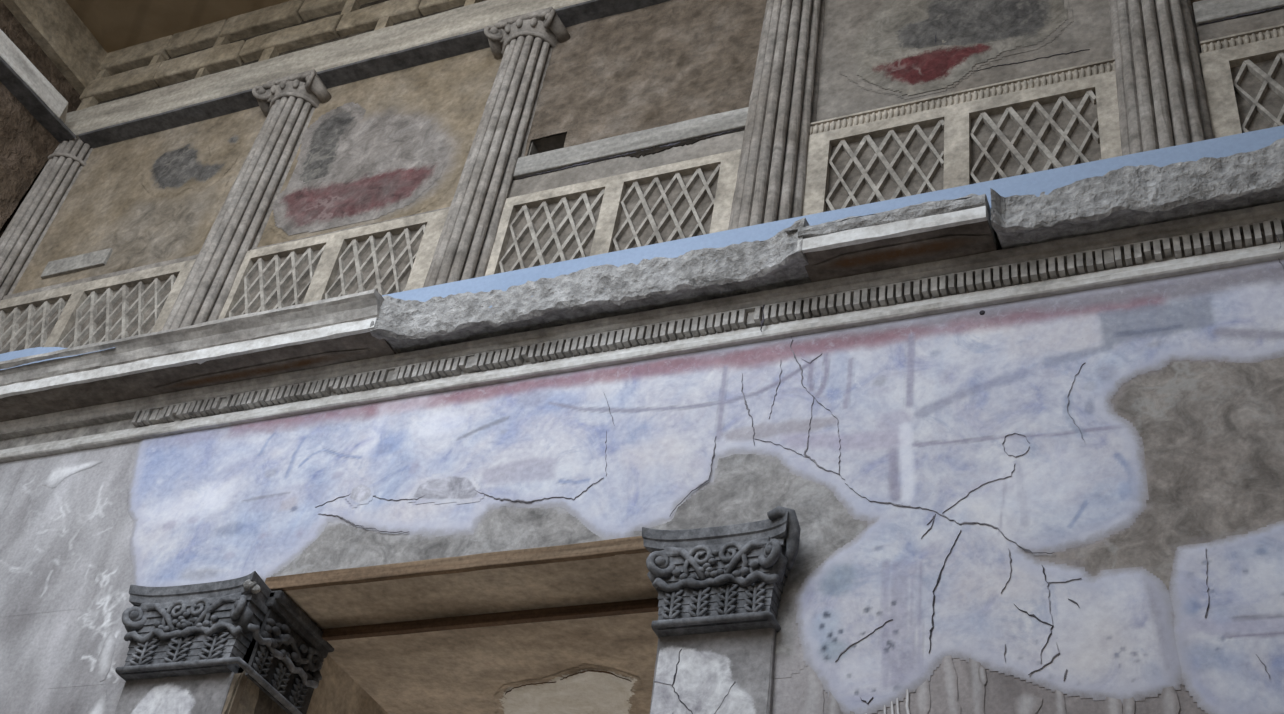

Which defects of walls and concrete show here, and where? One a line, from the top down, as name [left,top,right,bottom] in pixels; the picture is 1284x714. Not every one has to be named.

leakage [0,444,139,714]
crack [315,494,423,533]
flaking render [243,471,611,594]
crack [475,394,614,503]
flaking render [631,454,867,678]
crack [741,305,1082,680]
flaking render [1040,357,1284,590]
flaking render [493,664,642,714]
crack [654,649,735,714]
leakage [797,655,987,714]
leakage [1012,690,1066,714]
leakage [1104,697,1135,714]